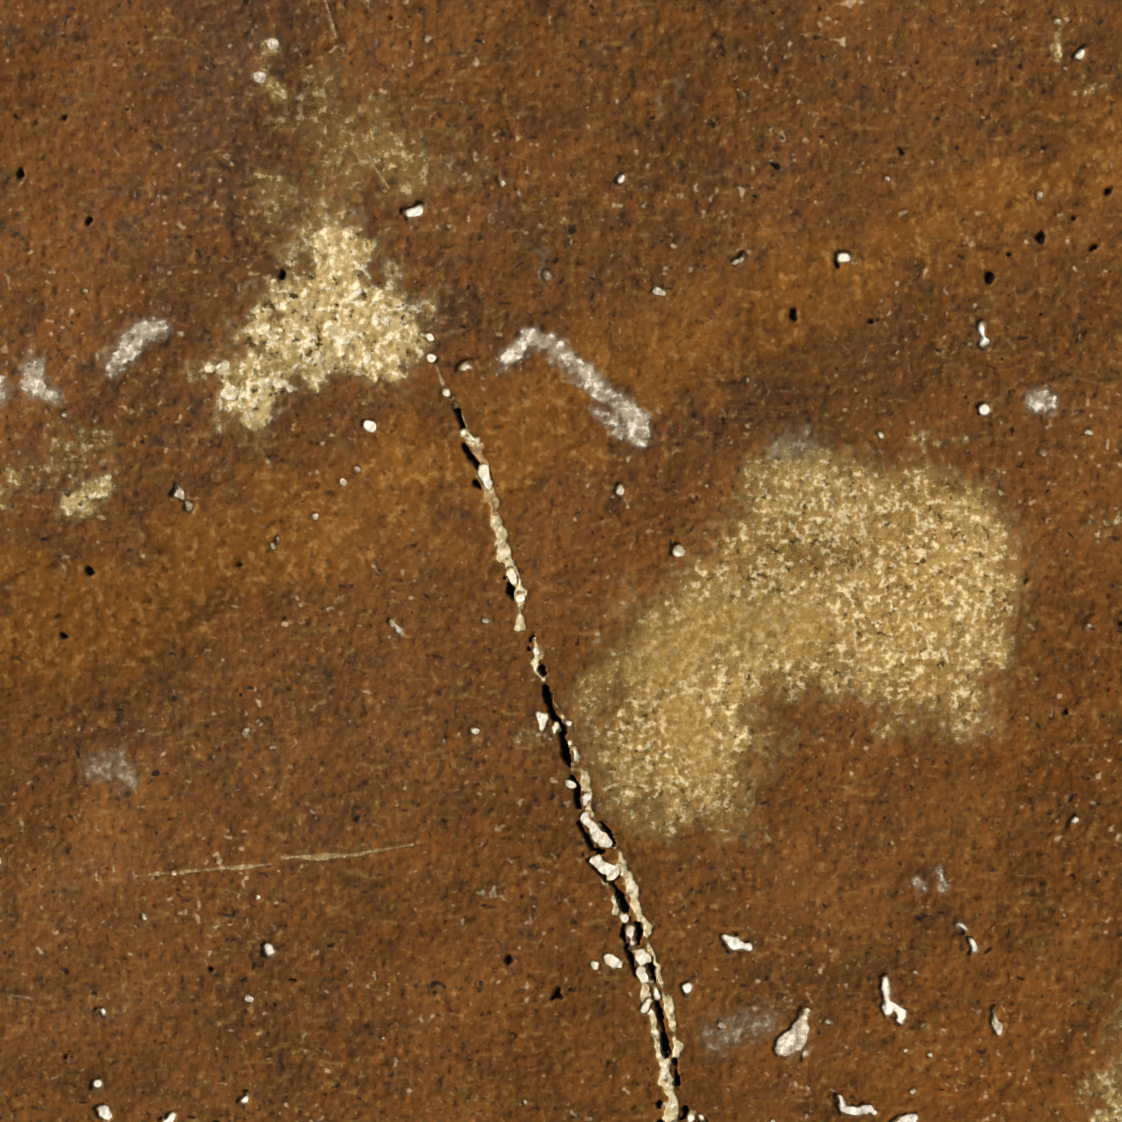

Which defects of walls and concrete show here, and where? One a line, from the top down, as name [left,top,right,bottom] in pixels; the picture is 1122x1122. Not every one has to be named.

crack [420,333,708,1122]